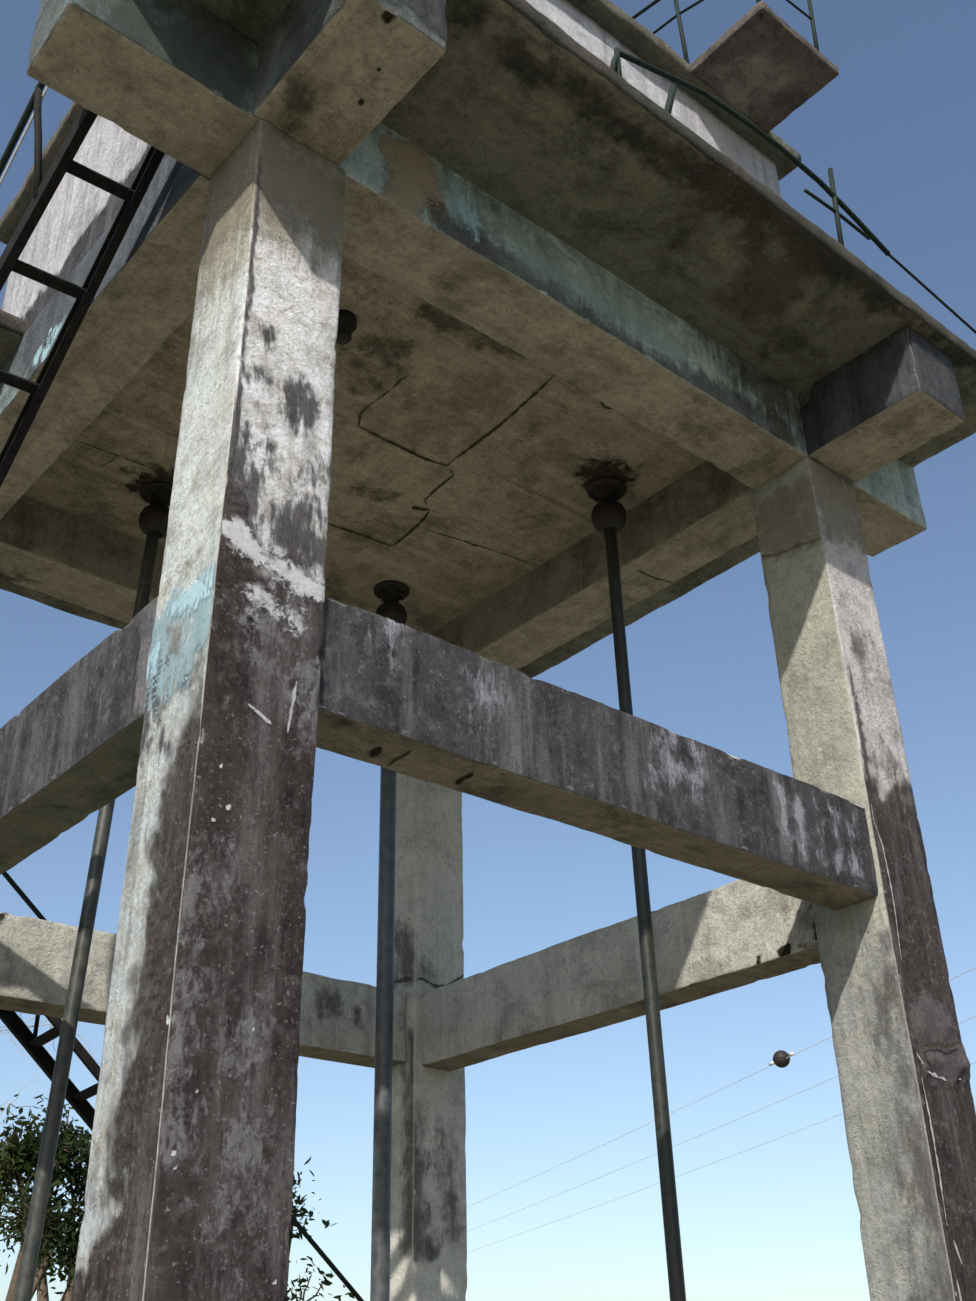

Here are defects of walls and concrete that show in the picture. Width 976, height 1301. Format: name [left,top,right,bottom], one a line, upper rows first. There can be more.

leakage [21,144,151,324]
leakage [200,124,346,577]
leakage [418,39,976,559]
crack [328,374,555,566]
leakage [0,626,170,819]
leakage [71,526,976,1301]
spalling [777,943,791,957]